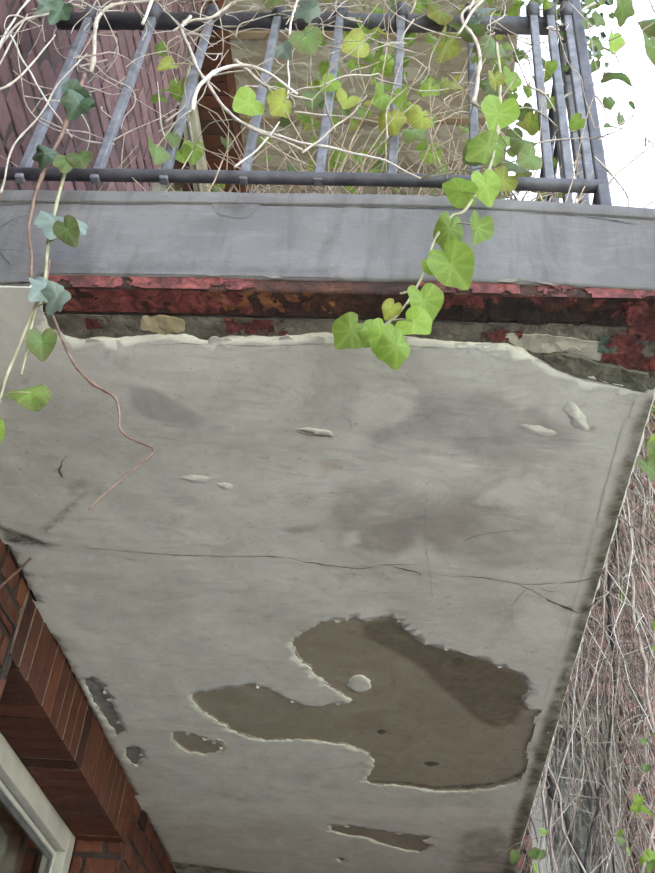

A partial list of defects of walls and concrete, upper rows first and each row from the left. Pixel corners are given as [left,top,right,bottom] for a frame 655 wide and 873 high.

peeling [42,273,335,344]
spalling [404,278,655,393]
crack [214,496,446,583]
crack [469,568,606,614]
spalling [83,679,124,735]
peeling [192,616,542,792]
spalling [125,747,145,765]
peeling [173,732,229,755]
peeling [331,826,432,852]